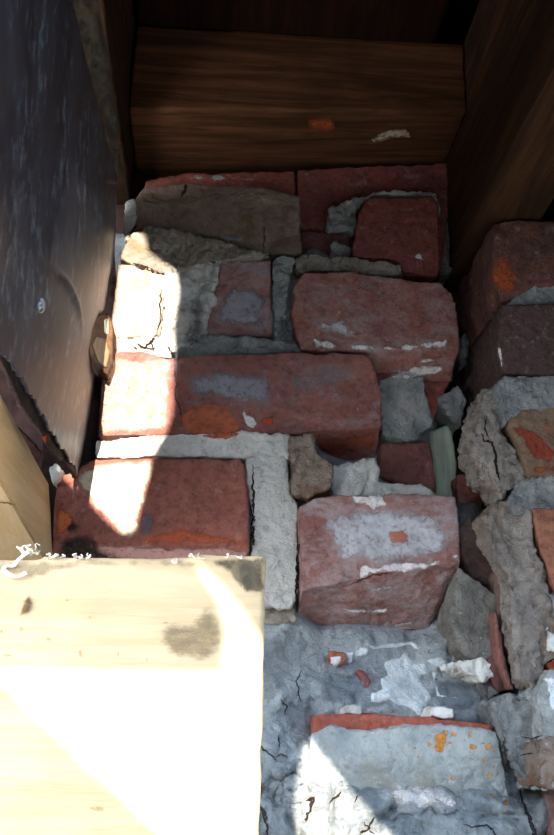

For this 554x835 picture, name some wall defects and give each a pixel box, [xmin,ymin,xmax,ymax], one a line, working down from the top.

crack [481,415,500,481]
damp [326,495,444,578]
crack [281,670,302,715]
crack [261,734,287,761]
crack [502,735,542,771]
crack [260,786,269,835]
crack [304,792,358,822]
crack [360,817,375,835]
crack [465,824,496,835]
crack [520,789,537,835]